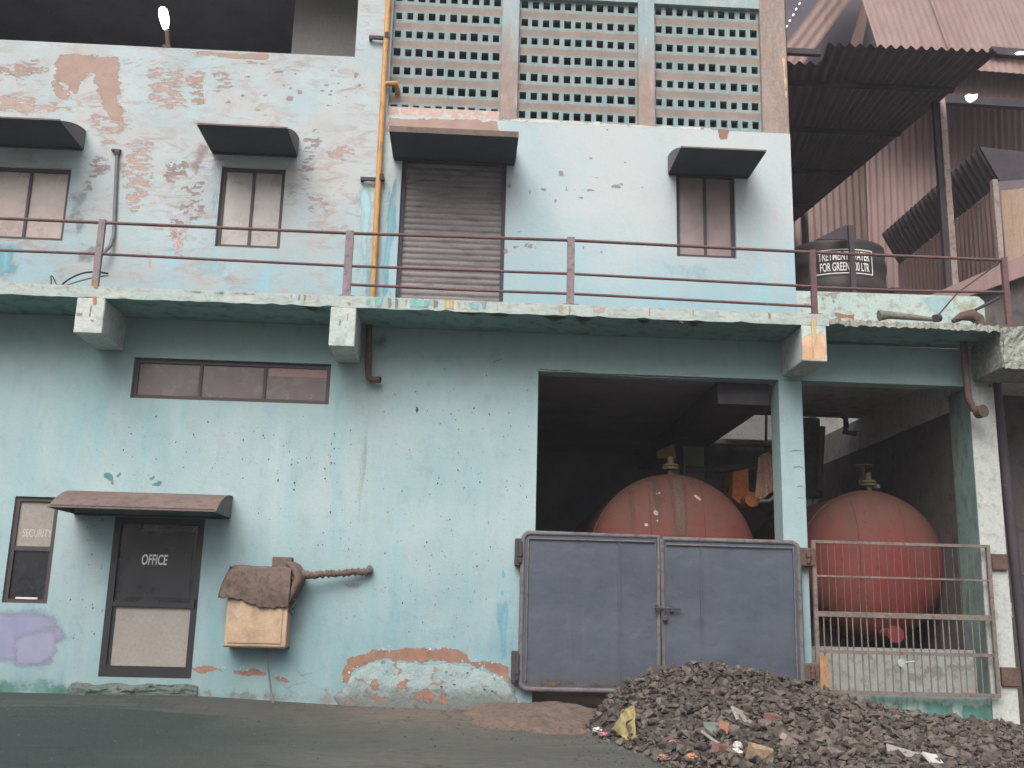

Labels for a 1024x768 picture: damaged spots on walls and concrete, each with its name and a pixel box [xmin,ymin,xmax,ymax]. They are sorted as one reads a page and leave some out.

peeling [198,51,269,78]
peeling [147,62,244,112]
peeling [384,115,729,139]
peeling [0,53,205,257]
flaking render [802,332,826,360]
peeling [342,600,513,684]
peeling [192,664,290,683]